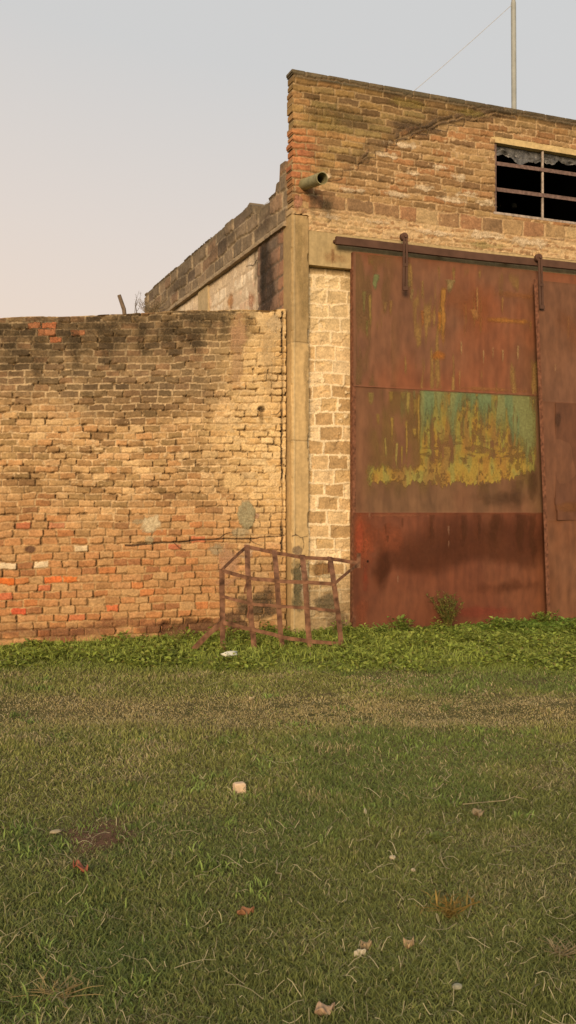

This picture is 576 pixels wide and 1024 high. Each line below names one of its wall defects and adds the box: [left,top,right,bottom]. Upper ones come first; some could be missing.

crack [334,119,468,181]
water stain [0,310,247,378]
peeling [369,265,537,489]
crack [275,392,283,479]
crack [125,526,307,552]